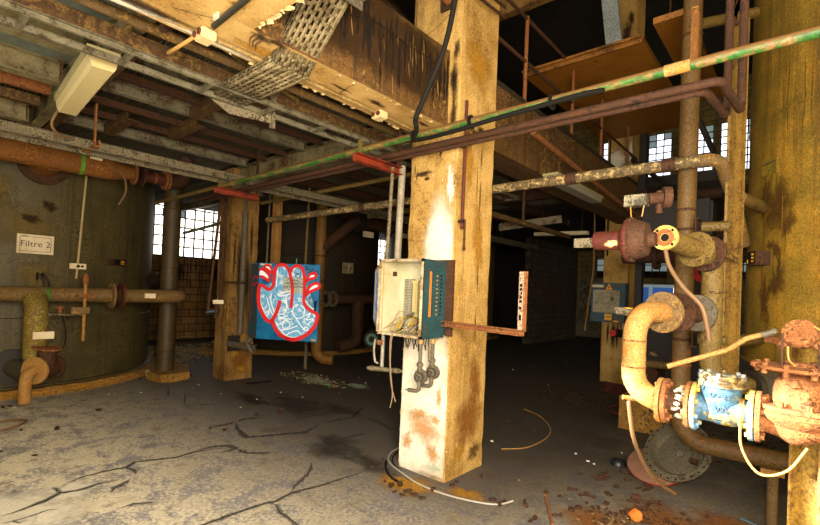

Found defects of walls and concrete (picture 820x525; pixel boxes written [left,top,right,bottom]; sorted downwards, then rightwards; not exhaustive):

damp [425,164,455,260]
crack [2,417,390,525]
damp [399,338,448,480]
rust [413,411,440,437]
rust [455,363,480,460]